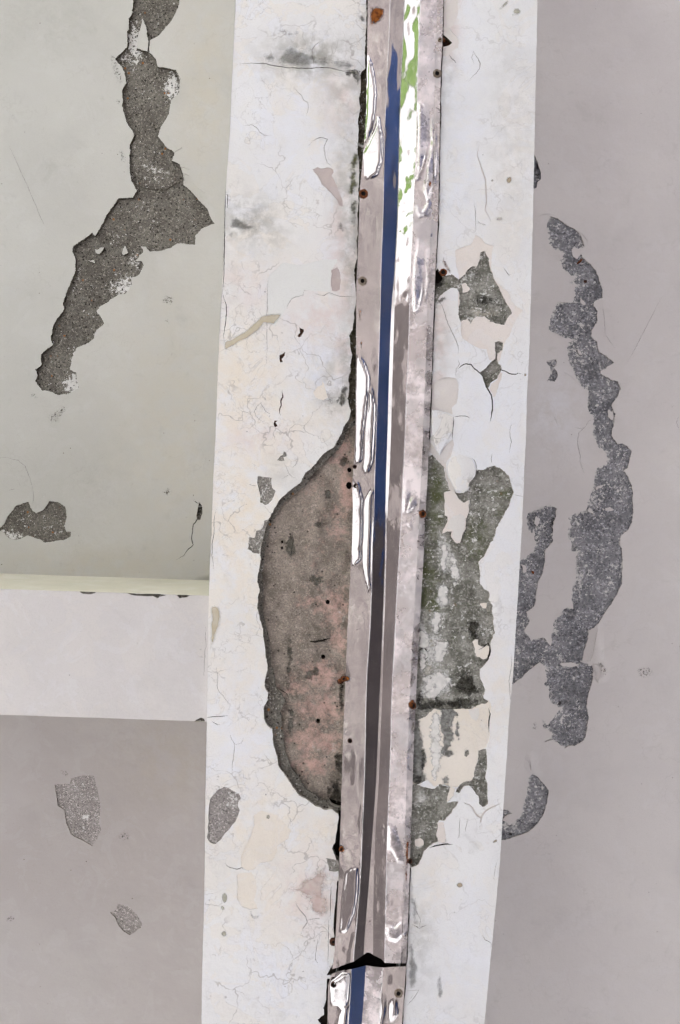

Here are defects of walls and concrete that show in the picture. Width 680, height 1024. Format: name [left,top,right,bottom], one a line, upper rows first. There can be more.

corrosion [370,8,384,24]
crack [244,43,351,113]
spalling [354,0,368,288]
spalling [35,0,215,395]
crack [221,235,229,337]
spalling [0,501,71,543]
spalling [248,306,356,816]
spalling [409,235,549,902]
spalling [512,214,634,748]
spalling [55,775,101,846]
spalling [207,787,241,844]
crack [297,894,331,963]